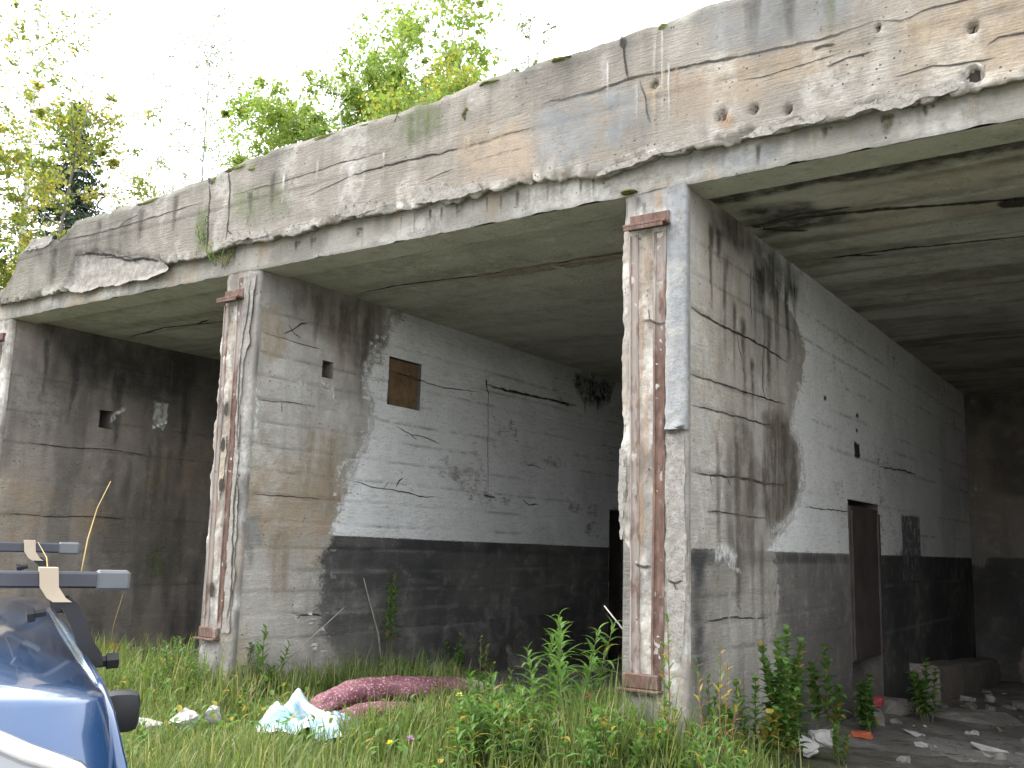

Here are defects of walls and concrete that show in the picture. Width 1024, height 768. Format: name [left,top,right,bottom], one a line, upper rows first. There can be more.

spalling [741,112,829,138]
spalling [64,250,168,293]
crack [63,130,523,249]
crack [360,272,499,294]
leakage [710,219,750,249]
crack [693,276,785,425]
leakage [758,252,795,368]
leakage [711,142,1024,233]
peeling [152,402,169,431]
crack [397,373,572,498]
crack [354,478,428,498]
leakage [715,405,806,575]